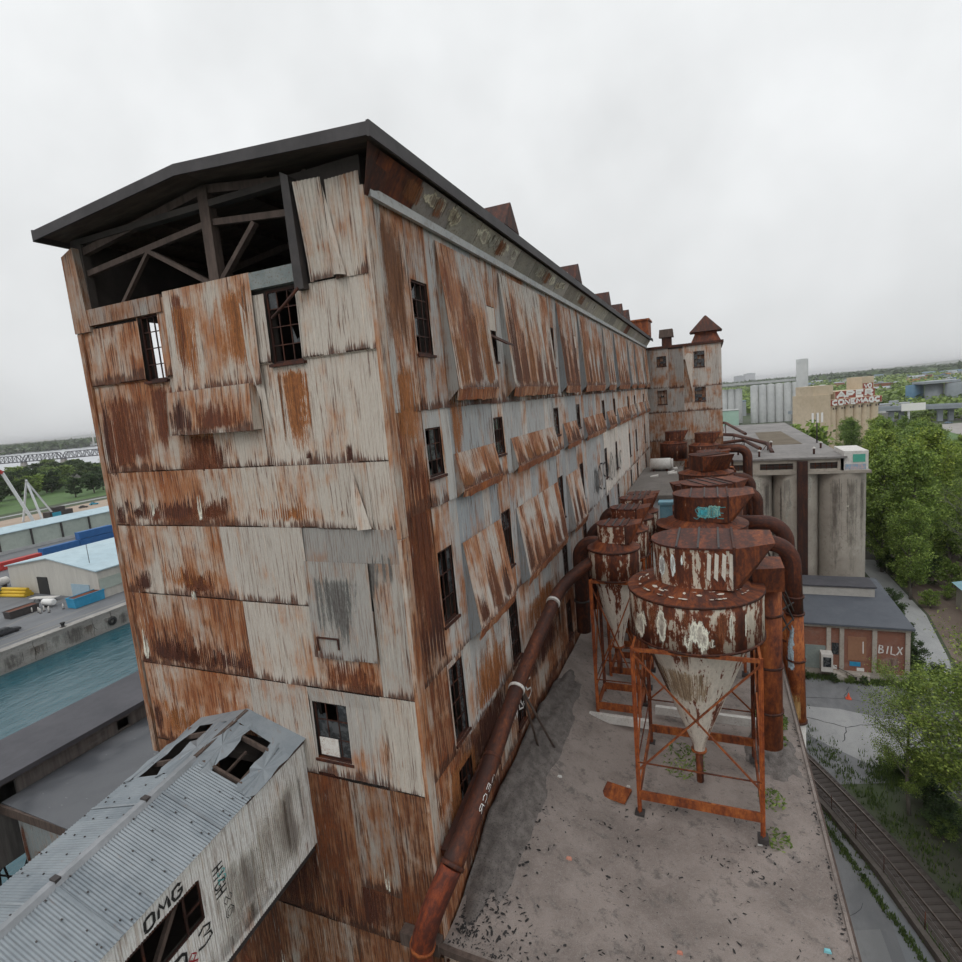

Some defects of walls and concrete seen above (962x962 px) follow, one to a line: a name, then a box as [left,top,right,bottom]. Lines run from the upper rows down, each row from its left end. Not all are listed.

corrosion [381,213,407,345]
corrosion [171,295,198,379]
corrosion [214,285,248,365]
corrosion [445,277,495,453]
corrosion [506,296,630,383]
corrosion [277,369,313,465]
corrosion [115,492,228,526]
corrosion [478,559,513,623]
peeling [635,608,666,643]
peeling [639,553,749,600]
peeling [681,619,714,654]
corrosion [441,632,507,835]